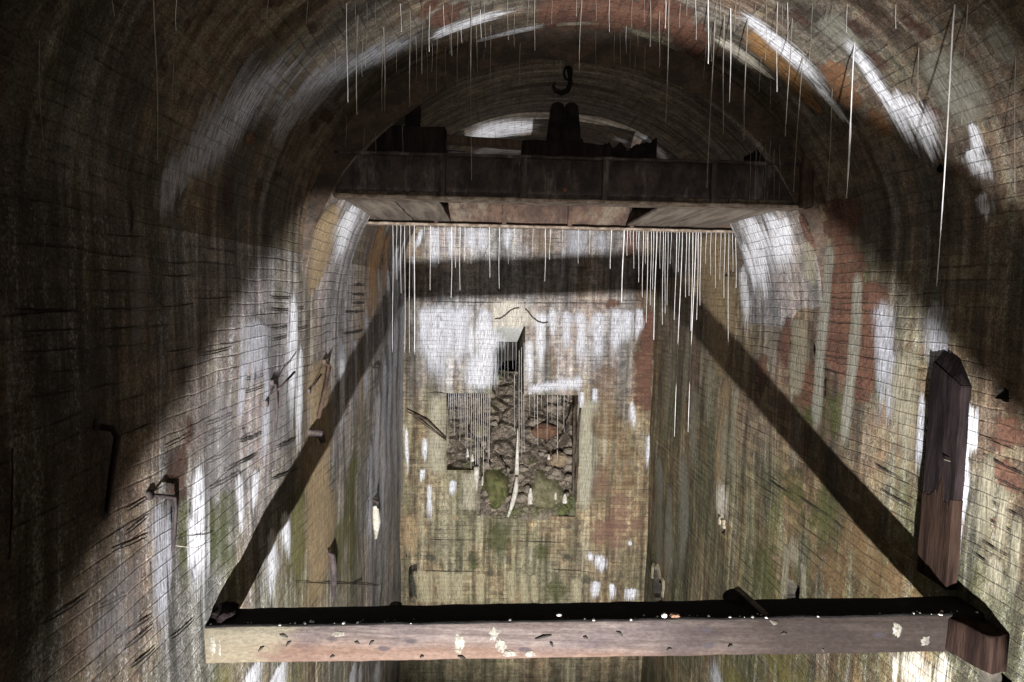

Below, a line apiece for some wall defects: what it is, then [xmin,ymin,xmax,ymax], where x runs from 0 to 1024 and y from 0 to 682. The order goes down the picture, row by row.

leakage [925,50,992,178]
leakage [977,193,989,221]
leakage [419,301,643,407]
leakage [874,305,924,461]
leakage [925,302,947,365]
flaking render [463,474,475,511]
leakage [962,408,1021,596]
leakage [584,553,636,600]